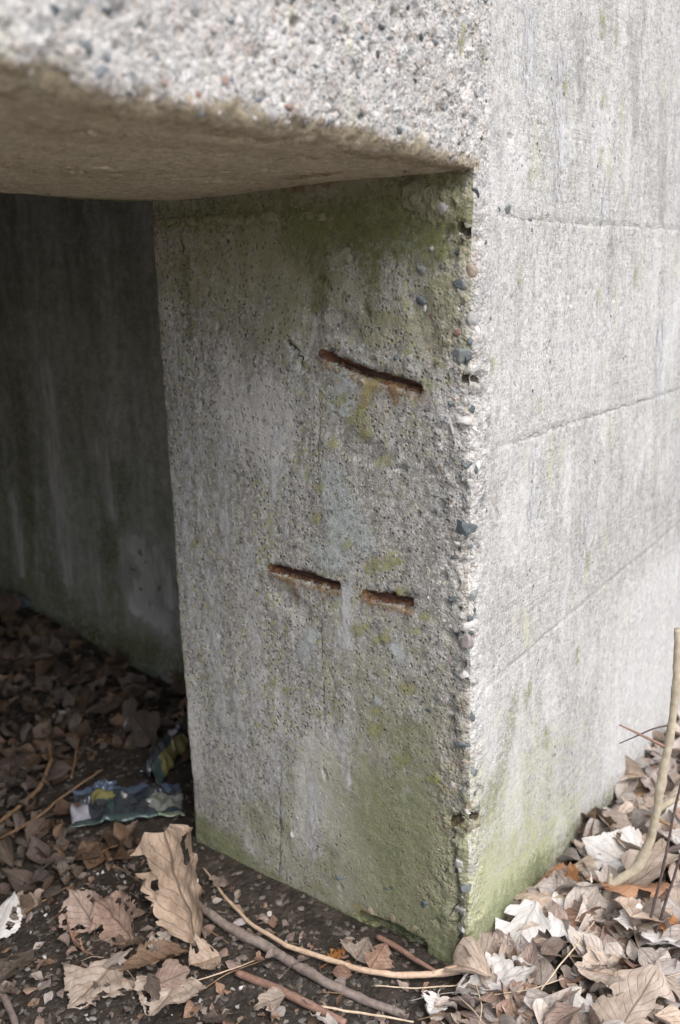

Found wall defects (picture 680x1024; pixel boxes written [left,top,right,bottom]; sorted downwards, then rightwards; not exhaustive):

leakage [332,573,352,665]